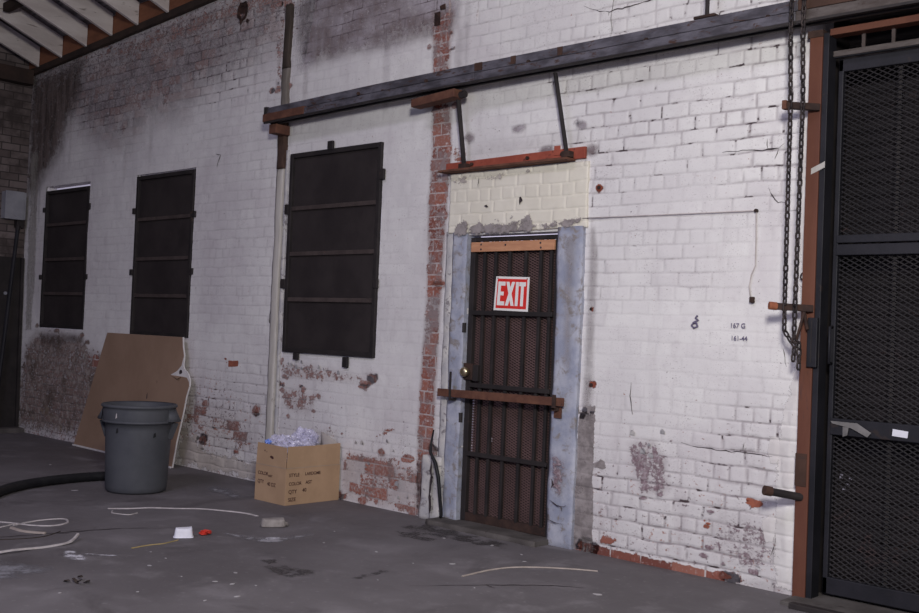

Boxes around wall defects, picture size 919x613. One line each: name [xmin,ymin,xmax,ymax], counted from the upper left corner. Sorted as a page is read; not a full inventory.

water stain [298,0,455,63]
crack [585,0,651,15]
flaking render [339,102,581,516]
flaking render [19,323,100,434]
peeling [279,358,377,418]
peeling [630,430,670,500]
flaking render [576,510,771,581]